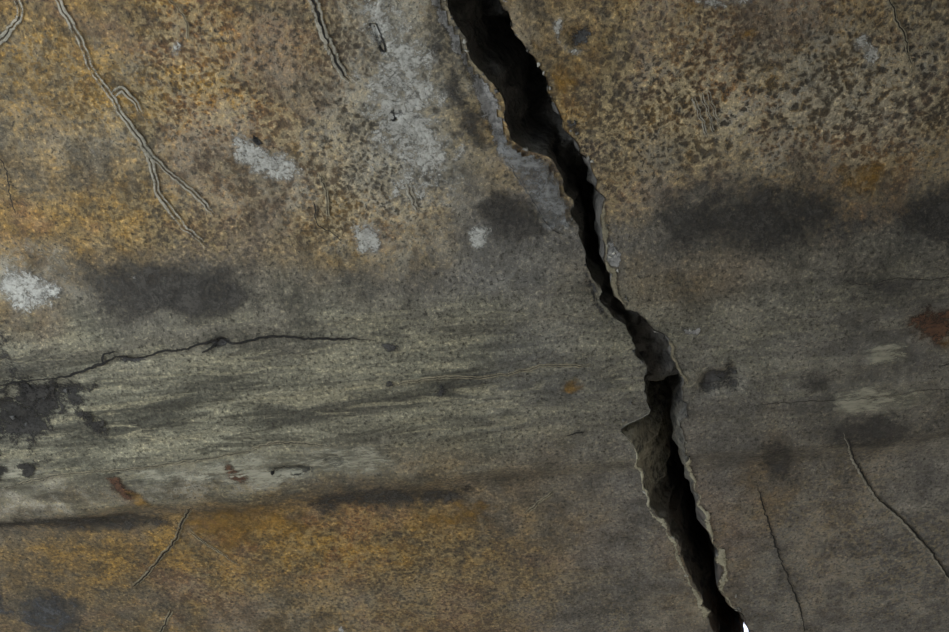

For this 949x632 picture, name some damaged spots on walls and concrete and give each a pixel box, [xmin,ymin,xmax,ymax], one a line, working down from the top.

crack [0,0,23,45]
crack [308,0,357,84]
crack [55,0,214,248]
water stain [84,263,265,325]
crack [446,0,751,632]
crack [0,335,374,386]
crack [397,364,589,385]
crack [844,435,949,582]
crack [757,485,805,631]